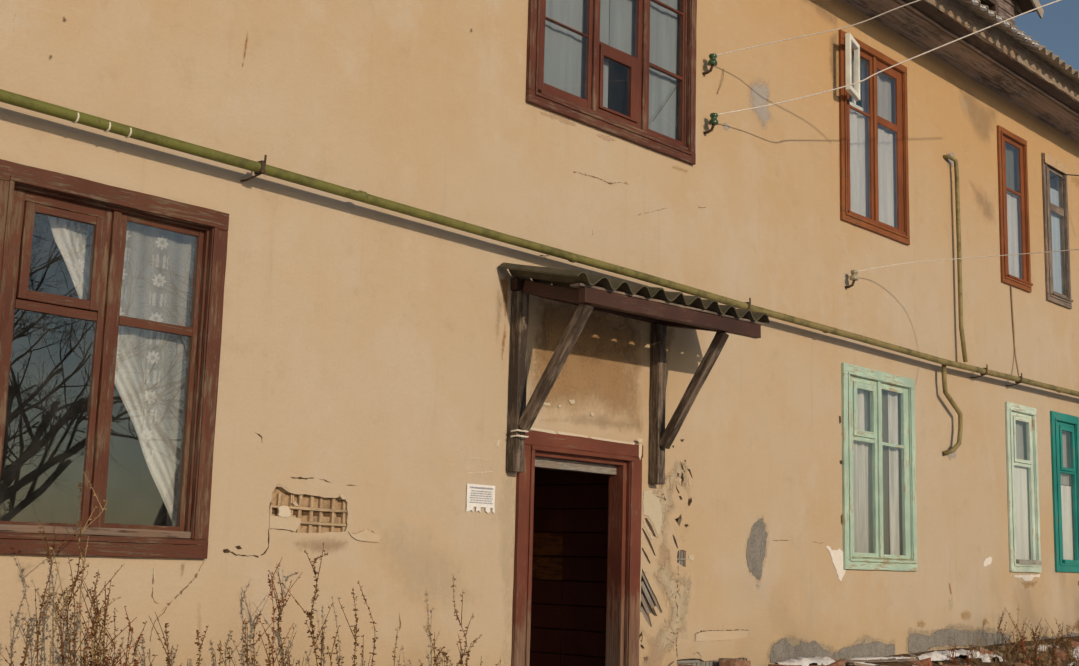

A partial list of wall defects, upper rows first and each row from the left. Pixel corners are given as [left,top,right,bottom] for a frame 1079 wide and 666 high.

water stain [536,305,576,377]
water stain [542,310,635,421]
spalling [269,487,347,533]
spalling [639,460,746,666]